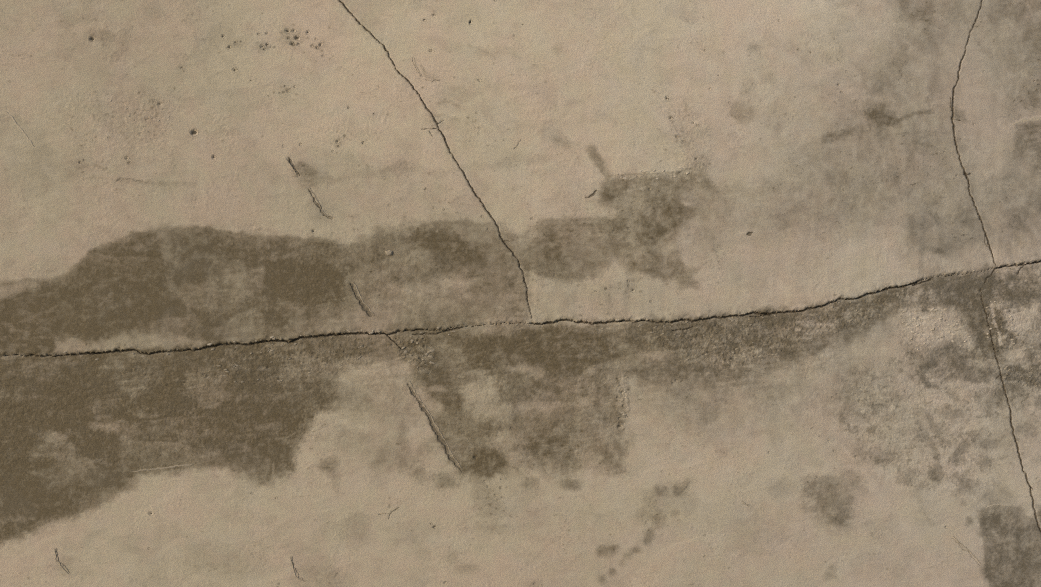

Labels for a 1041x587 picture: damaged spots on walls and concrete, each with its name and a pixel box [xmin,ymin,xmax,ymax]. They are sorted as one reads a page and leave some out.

damp [292,160,416,223]
damp [502,0,1041,294]
crack [339,0,1041,532]
crack [47,326,473,360]
damp [0,217,1041,553]
damp [594,477,693,584]
damp [955,474,1041,587]